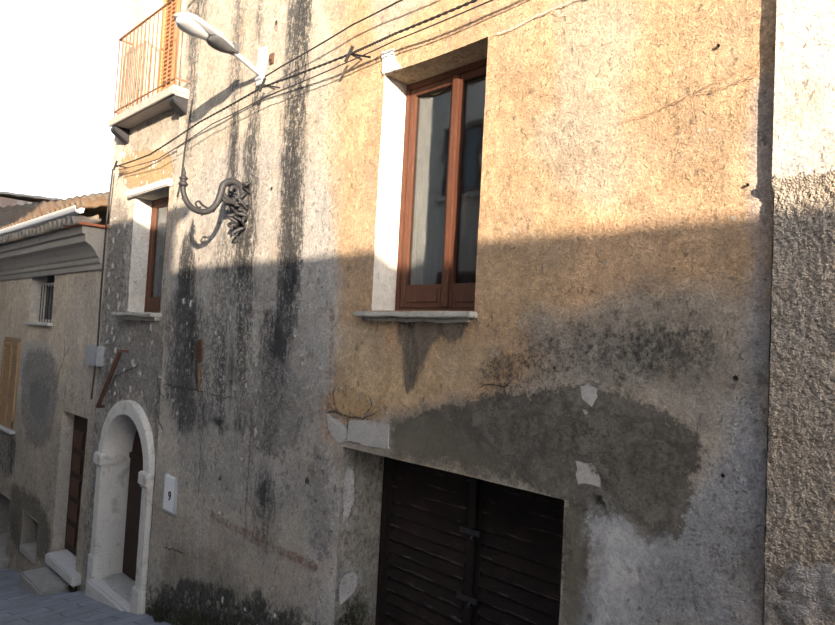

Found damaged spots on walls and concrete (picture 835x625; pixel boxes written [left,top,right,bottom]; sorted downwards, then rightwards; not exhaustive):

damp [186,37,199,157]
damp [211,0,312,453]
damp [9,485,50,559]
damp [175,232,198,439]
crack [327,383,381,429]
damp [382,315,718,625]